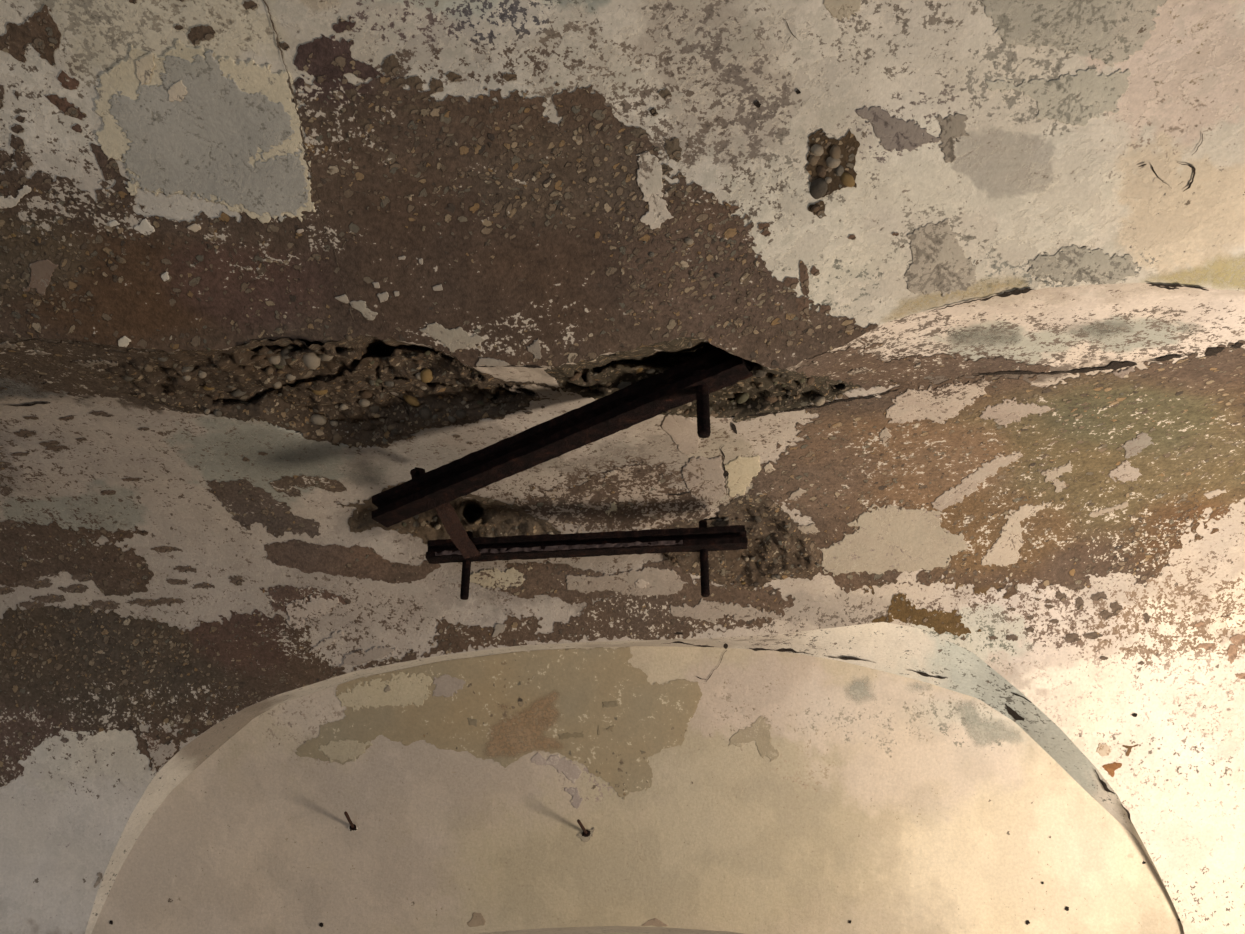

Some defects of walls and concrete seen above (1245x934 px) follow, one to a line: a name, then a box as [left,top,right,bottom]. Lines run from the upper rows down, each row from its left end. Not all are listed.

crack [263,0,356,325]
peeling [0,0,1245,658]
crack [8,400,50,408]
peeling [0,519,417,789]
peeling [1198,612,1245,679]
peeling [295,647,702,809]
peeling [728,716,779,762]
spalling [1005,703,1024,721]
peeling [1096,743,1137,777]